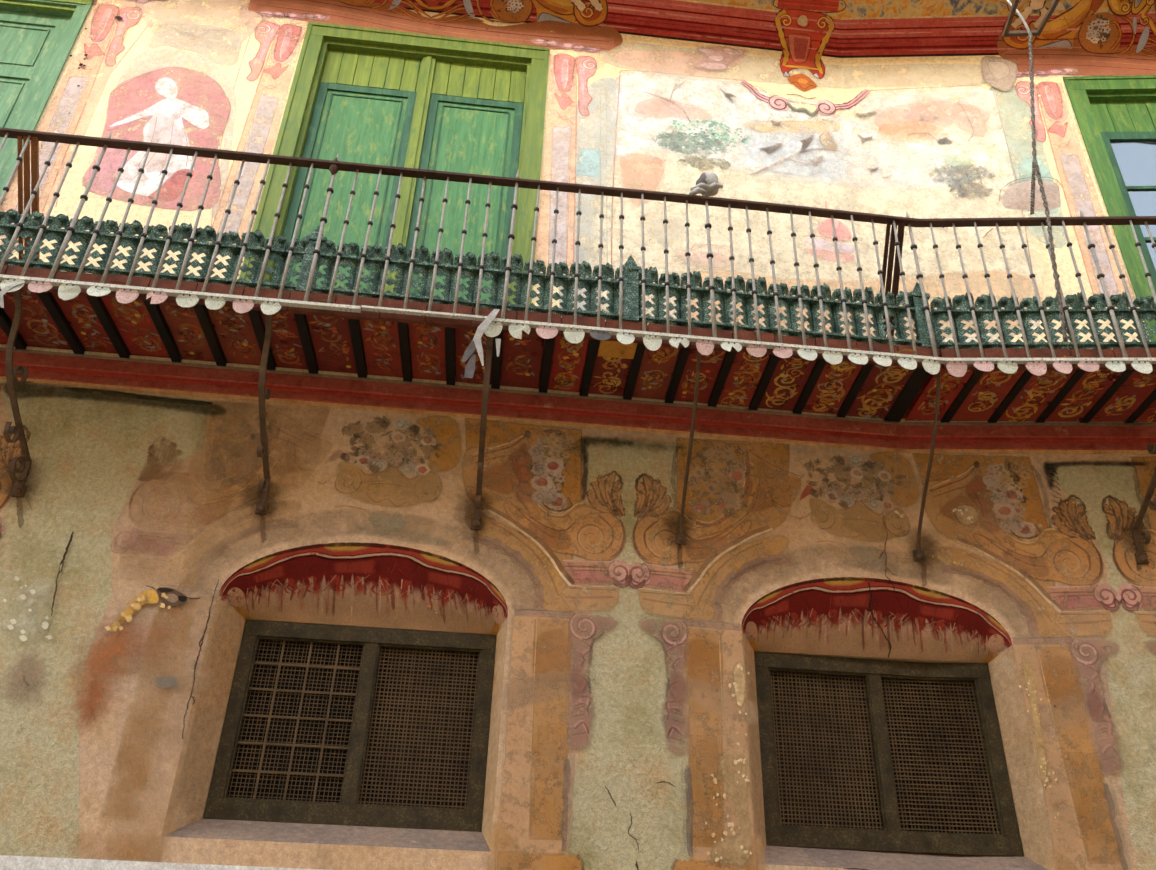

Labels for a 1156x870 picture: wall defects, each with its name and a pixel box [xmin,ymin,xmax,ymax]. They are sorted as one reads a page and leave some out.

crack [868,515,896,658]
crack [182,579,219,739]
crack [605,786,639,870]